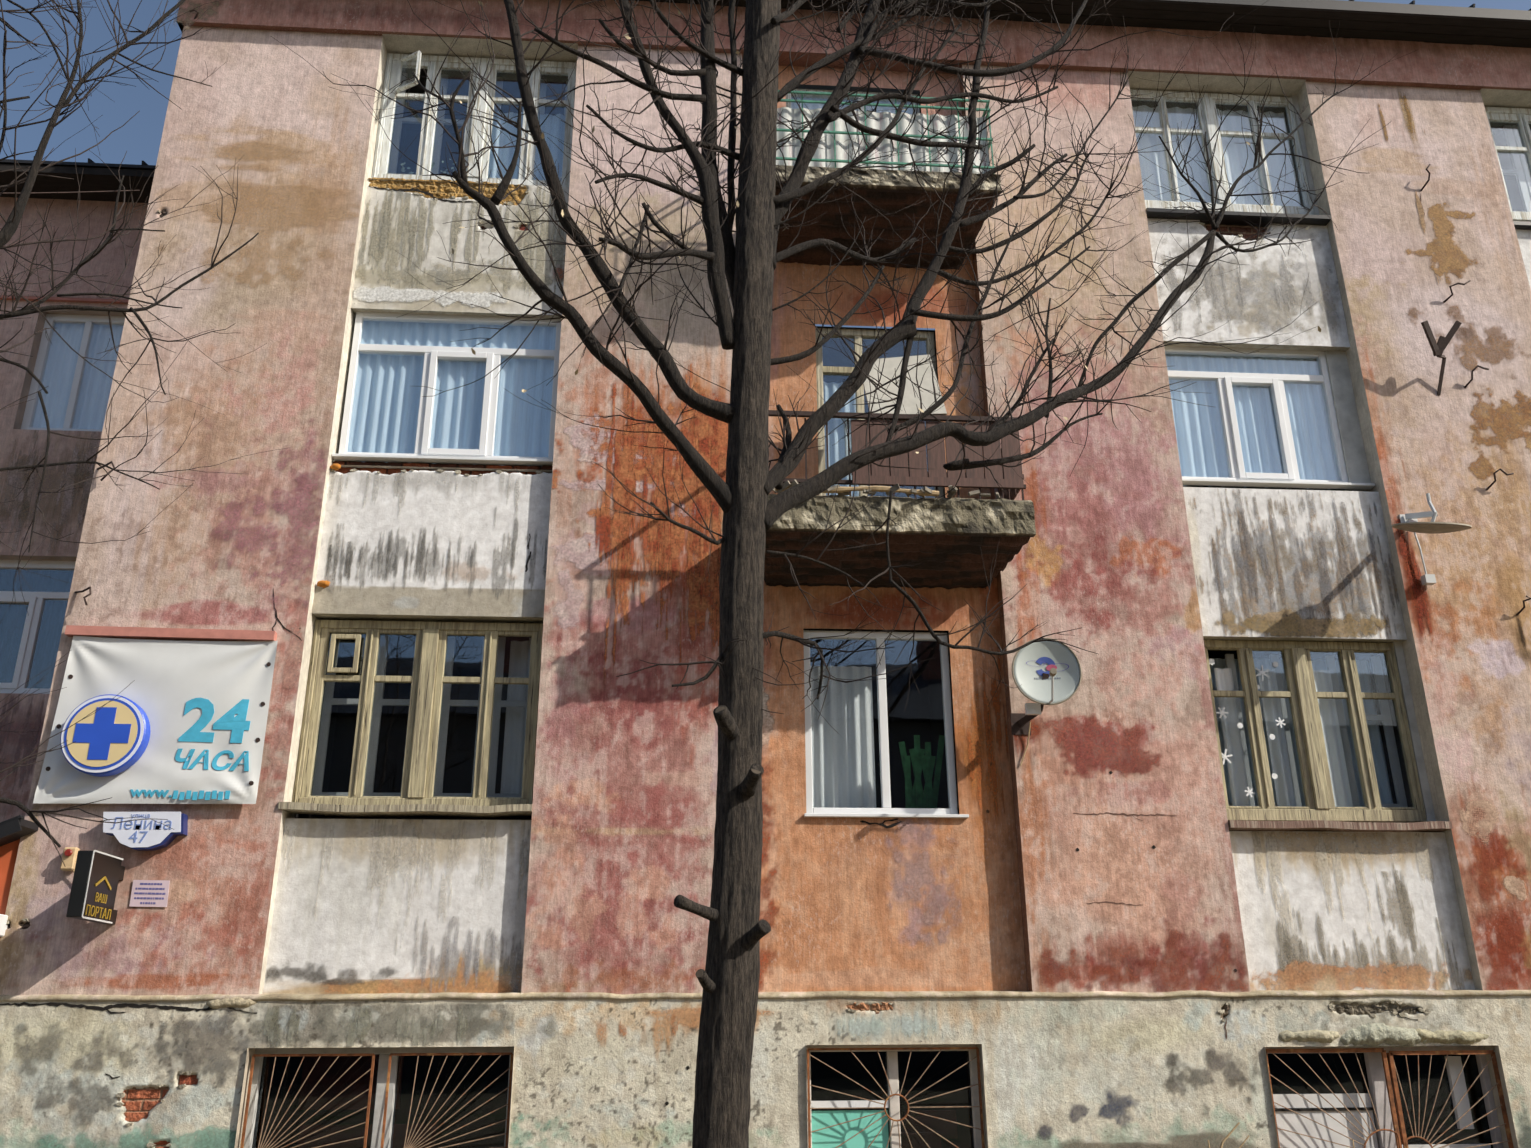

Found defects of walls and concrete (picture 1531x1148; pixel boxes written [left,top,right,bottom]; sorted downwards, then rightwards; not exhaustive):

damp [207,143,565,295]
flaking render [367,177,529,231]
flaking render [1406,192,1477,284]
flaking render [1437,306,1523,370]
flaking render [1469,388,1531,480]
damp [326,529,476,593]
damp [494,519,547,597]
corrosion [577,350,728,678]
damp [1196,488,1399,638]
damp [1252,832,1462,990]
peeling [115,1071,236,1148]